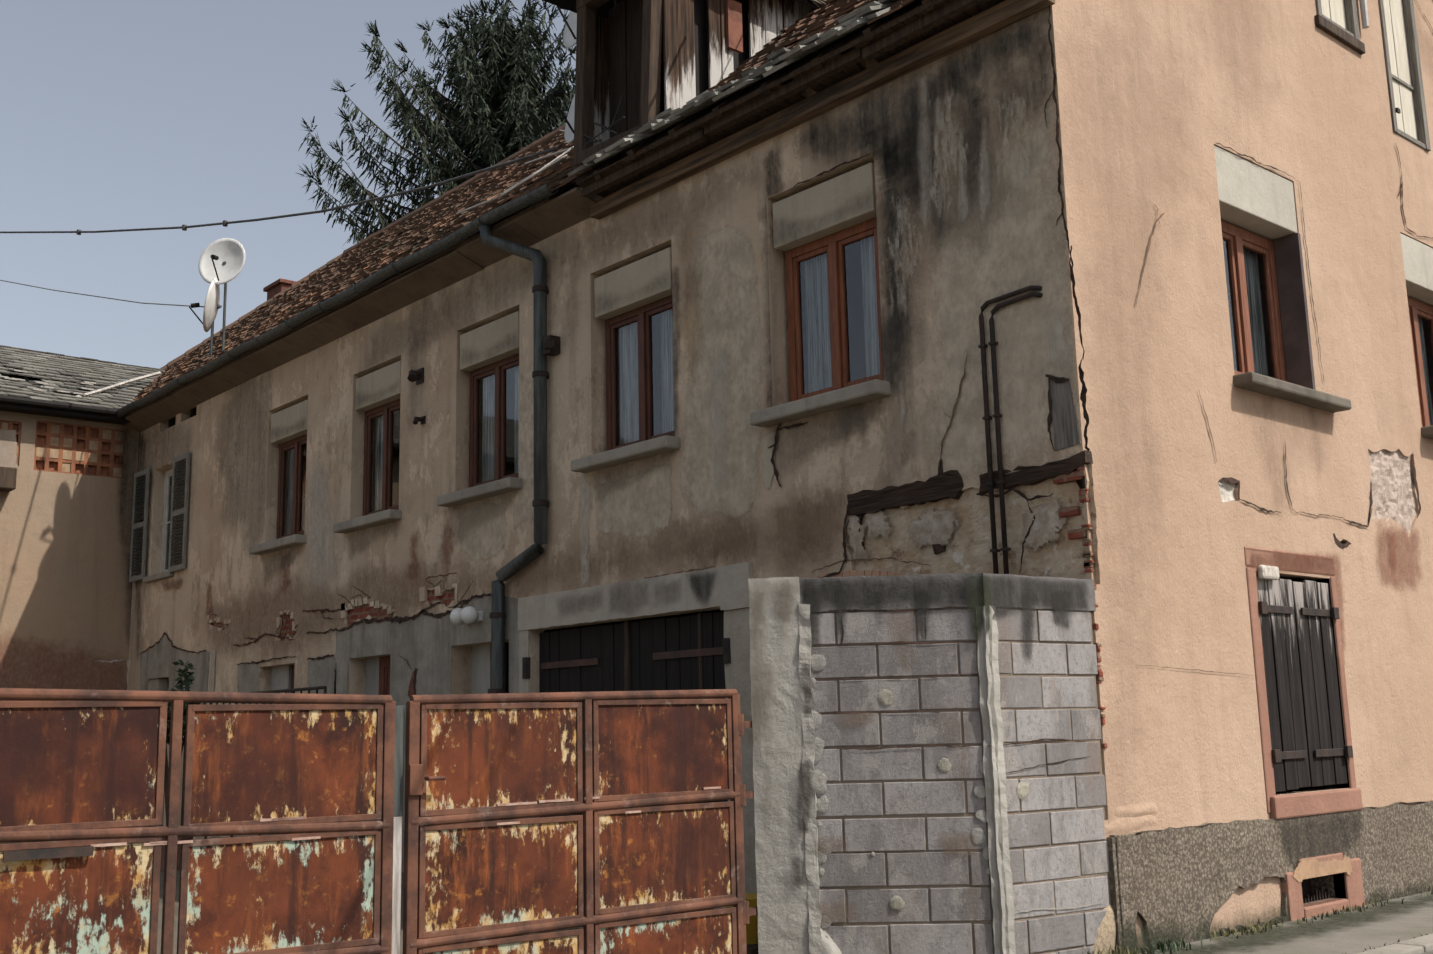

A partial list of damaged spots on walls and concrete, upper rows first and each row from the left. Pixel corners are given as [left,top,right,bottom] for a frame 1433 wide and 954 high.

water stain [803,16,1073,475]
crack [1044,5,1090,452]
crack [938,352,968,469]
crack [768,422,808,487]
crack [1240,444,1372,527]
spalling [1368,450,1421,533]
spalling [337,586,395,626]
spalling [419,572,474,607]
water stain [801,579,969,644]
spalling [847,450,1104,684]
water stain [988,577,1087,656]
water stain [804,663,812,712]